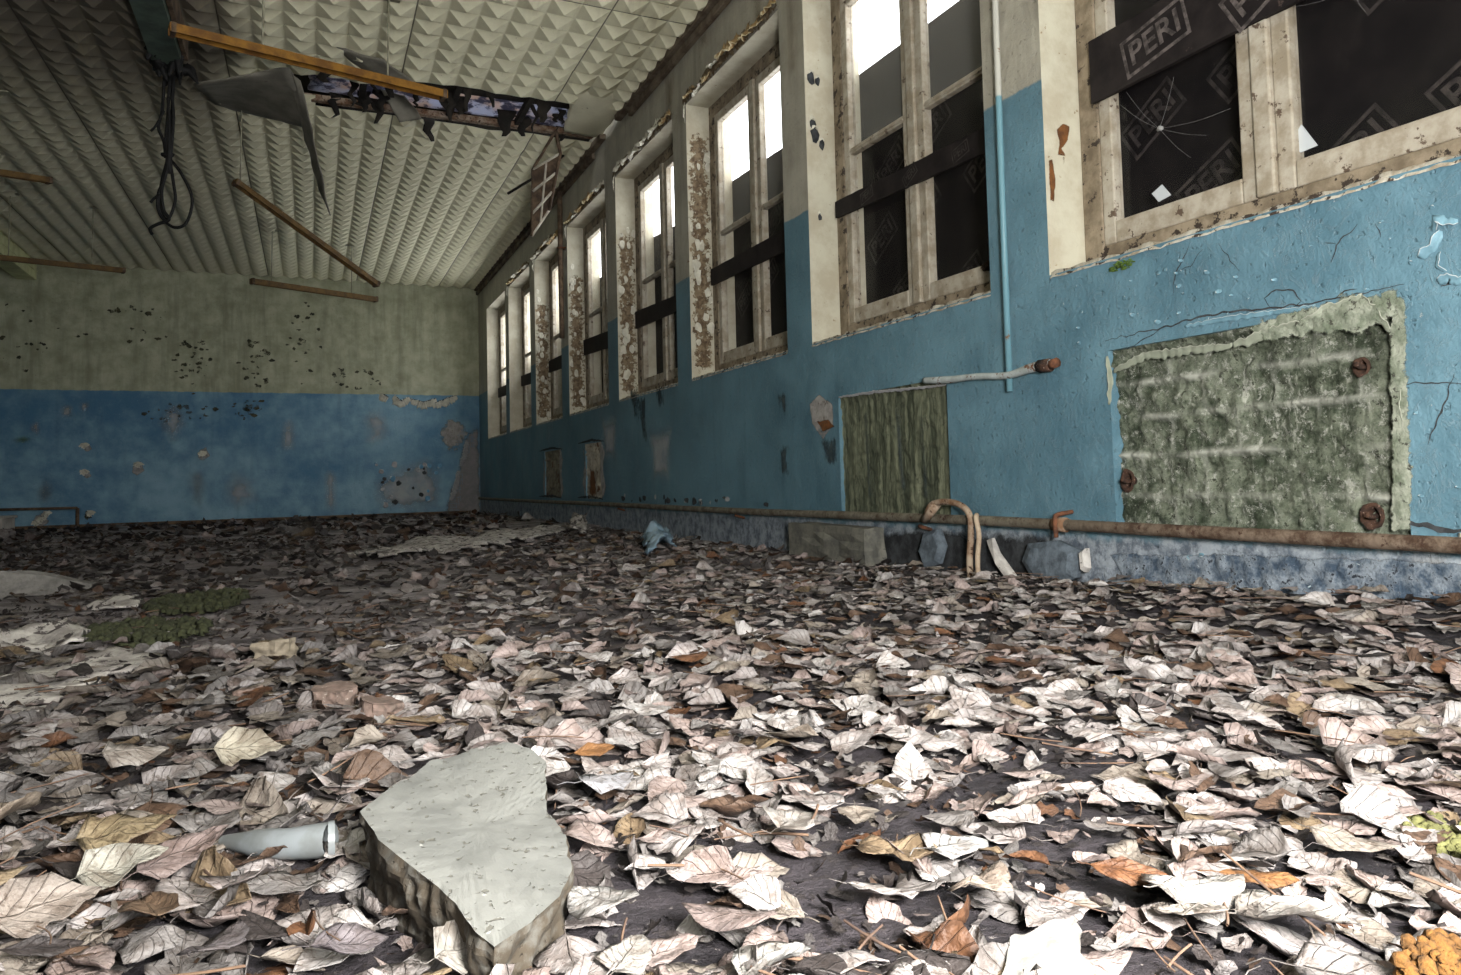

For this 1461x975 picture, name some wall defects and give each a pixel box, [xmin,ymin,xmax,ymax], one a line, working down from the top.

corrosion [1049,124,1069,201]
peeling [506,0,776,420]
peeling [1409,205,1461,286]
flaking render [374,430,481,512]
spalling [810,382,951,515]
spalling [1106,275,1461,537]
crack [1407,376,1461,443]